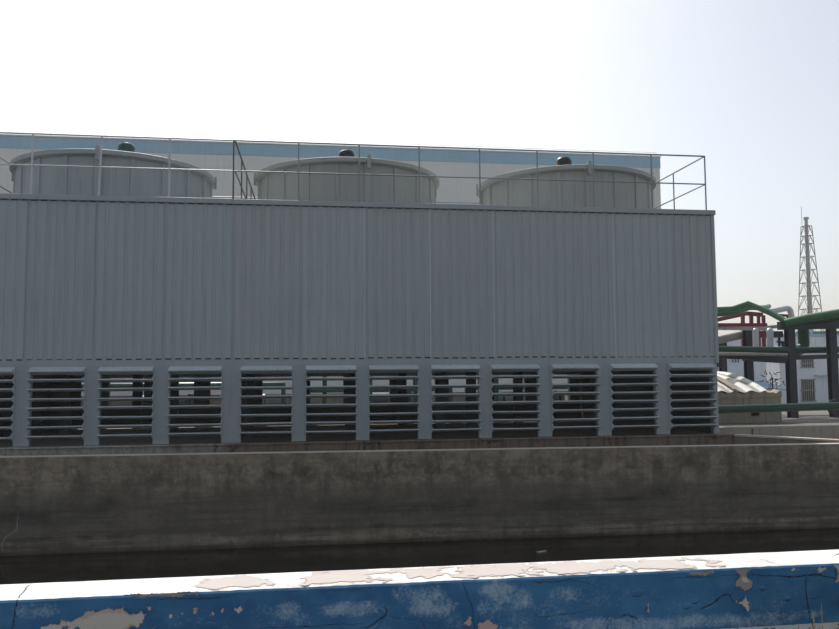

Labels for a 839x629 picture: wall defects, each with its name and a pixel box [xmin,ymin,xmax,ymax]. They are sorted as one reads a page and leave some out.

peeling [41,575,277,629]
peeling [463,616,498,629]
peeling [300,556,726,586]
peeling [735,569,752,612]